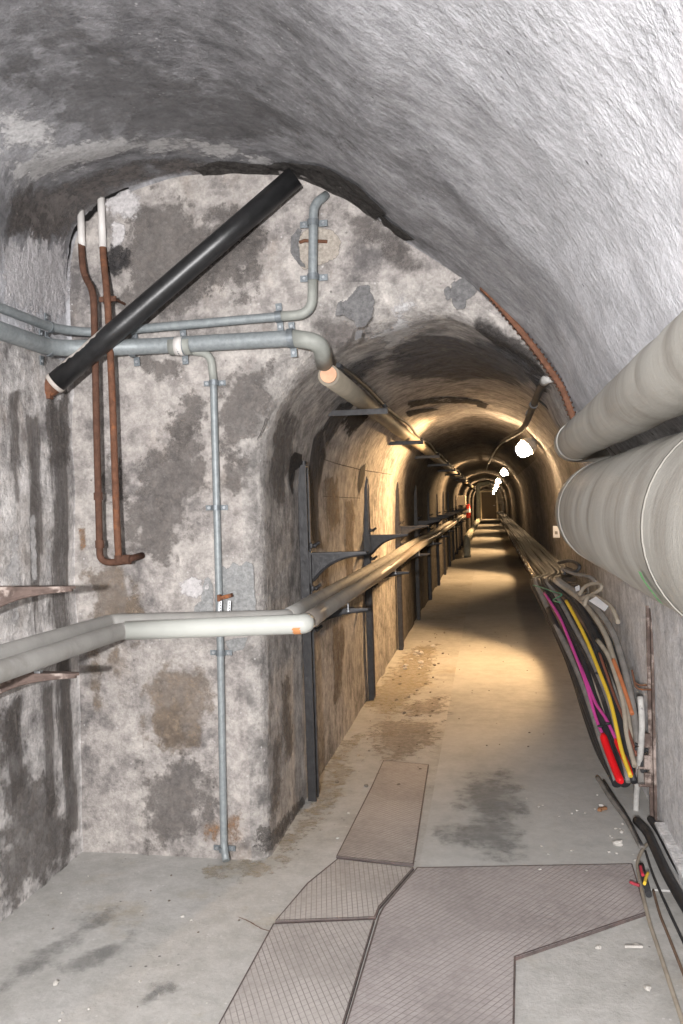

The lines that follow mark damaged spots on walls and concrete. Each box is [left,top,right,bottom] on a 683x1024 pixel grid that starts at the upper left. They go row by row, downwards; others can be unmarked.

leakage [5,389,70,631]
leakage [101,392,206,567]
leakage [141,665,220,856]